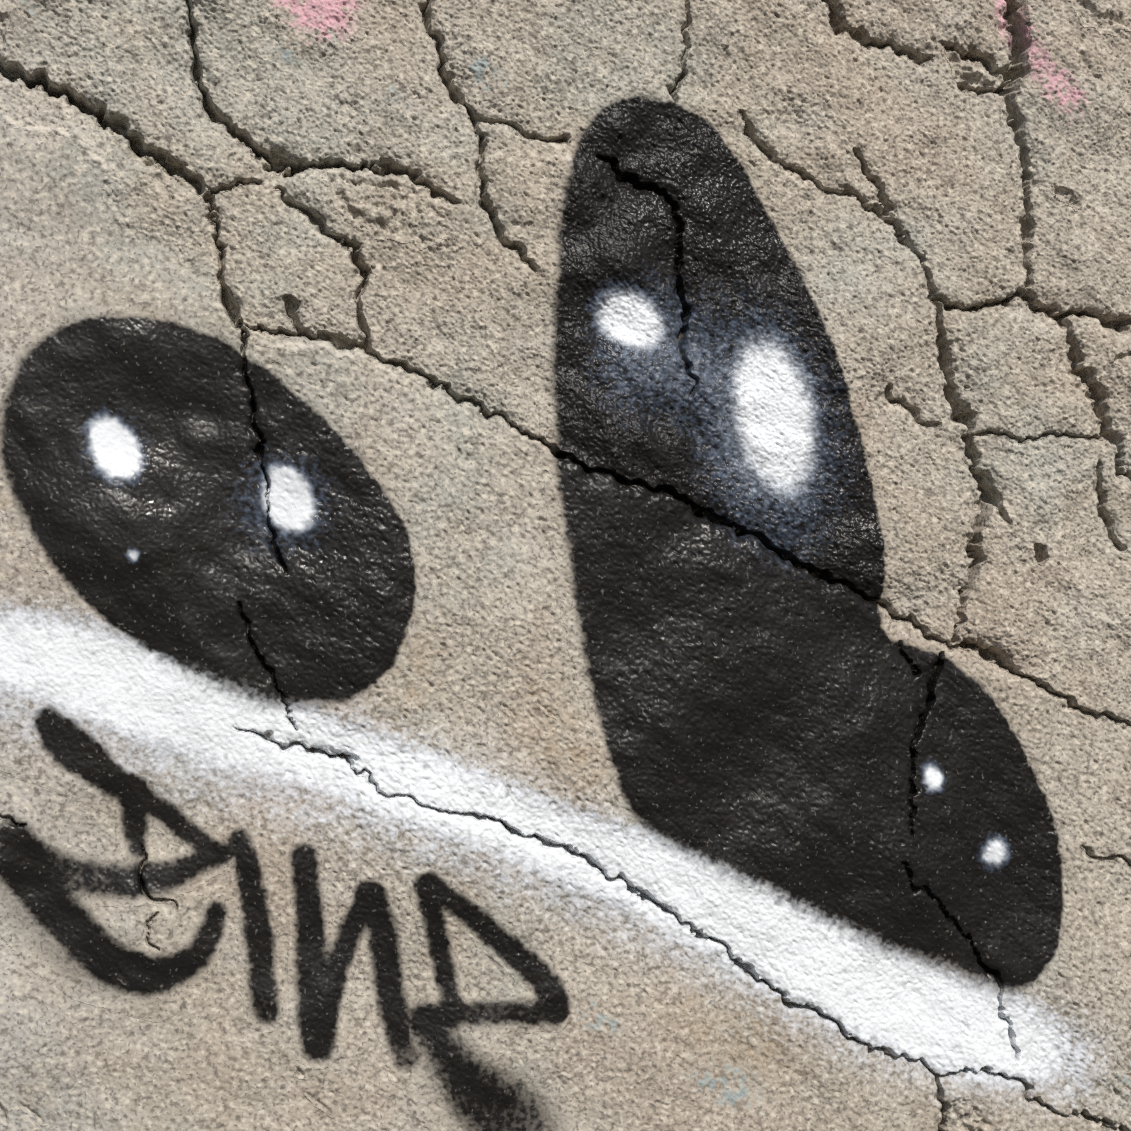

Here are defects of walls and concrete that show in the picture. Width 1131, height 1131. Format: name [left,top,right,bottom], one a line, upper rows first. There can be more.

crack [0,0,1131,837]
crack [138,845,180,953]
crack [230,601,1131,1131]